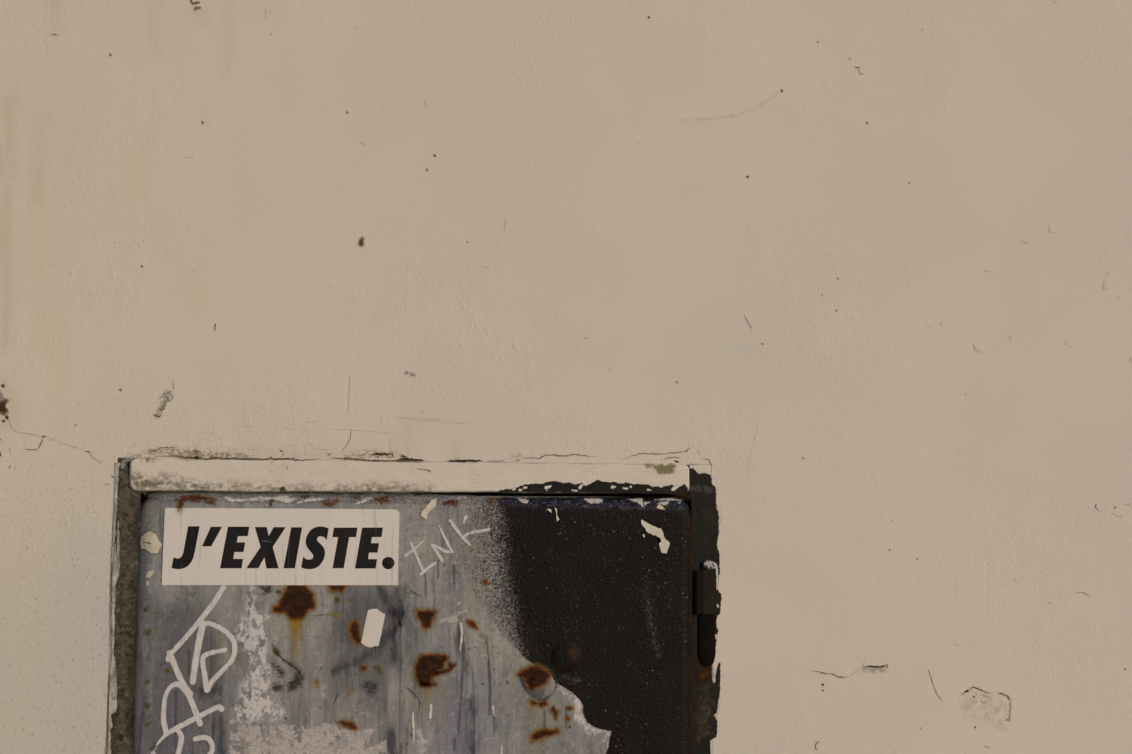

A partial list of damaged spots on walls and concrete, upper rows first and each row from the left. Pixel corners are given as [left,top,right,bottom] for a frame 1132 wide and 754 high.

crack [625,447,712,466]
crack [0,400,123,754]
rust [272,585,316,641]
rust [328,585,362,645]
rust [416,609,438,630]
rust [414,653,457,688]
crack [812,657,888,678]
rust [517,665,574,742]